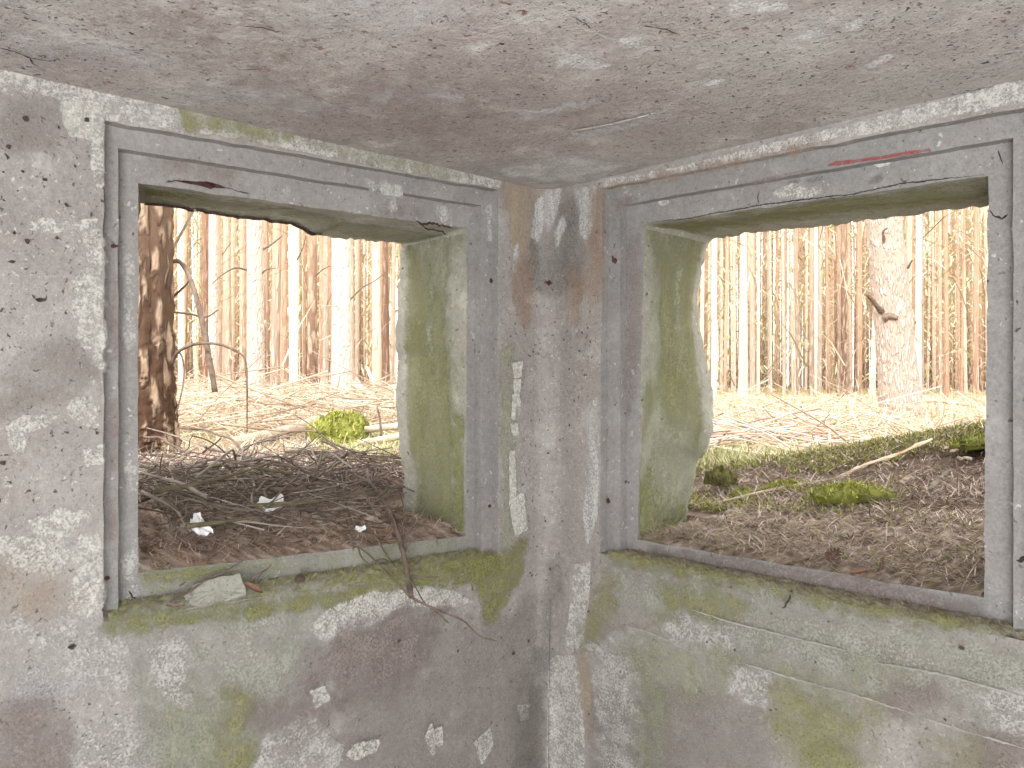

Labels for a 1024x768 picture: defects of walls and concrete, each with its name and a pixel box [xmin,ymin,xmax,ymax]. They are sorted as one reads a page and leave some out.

crack [648,150,1003,223]
crack [415,220,451,235]
water stain [652,546,978,613]
water stain [609,565,1024,741]